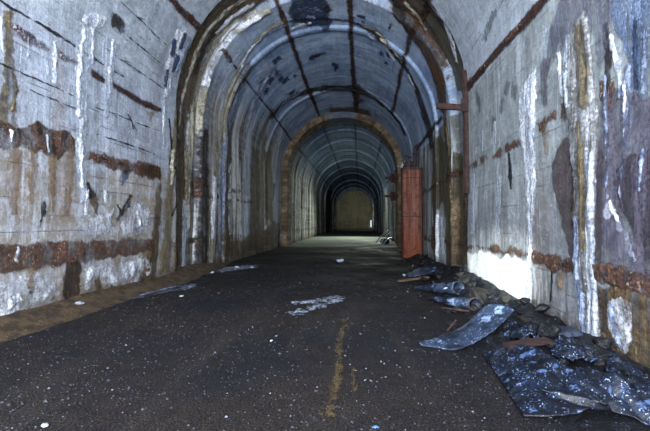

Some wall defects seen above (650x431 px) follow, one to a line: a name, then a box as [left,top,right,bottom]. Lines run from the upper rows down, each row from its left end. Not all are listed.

rust [0,121,76,216]
efflorescence [75,12,117,204]
rust [87,152,162,180]
damp [139,0,476,281]
rust [423,140,521,193]
rust [528,103,567,137]
damp [499,0,650,369]
rust [0,237,155,294]
rust [424,237,574,289]
rust [592,261,650,300]